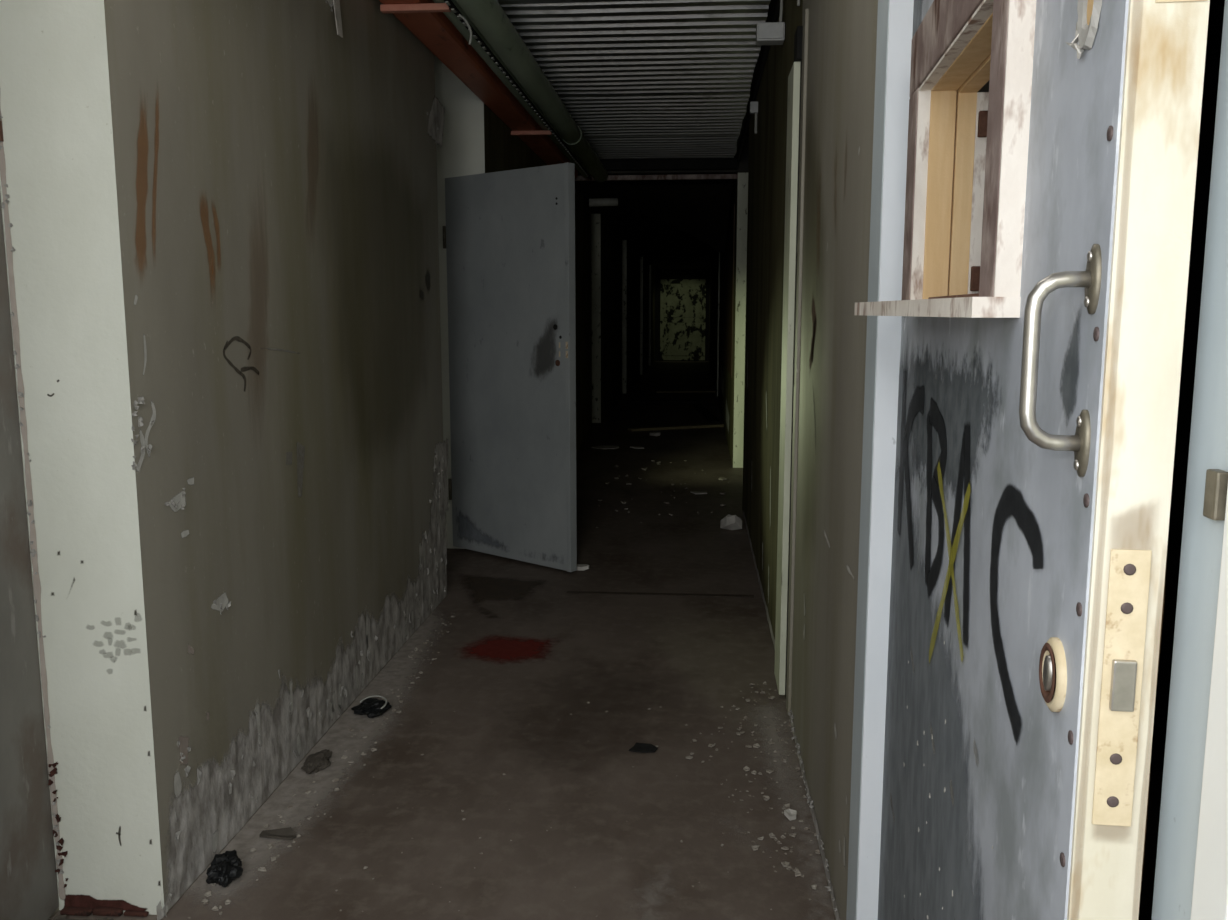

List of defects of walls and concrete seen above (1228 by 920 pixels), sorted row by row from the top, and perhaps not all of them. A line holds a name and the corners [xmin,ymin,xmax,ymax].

rust [135,104,159,268]
rust [200,201,221,284]
peeling [48,440,449,920]